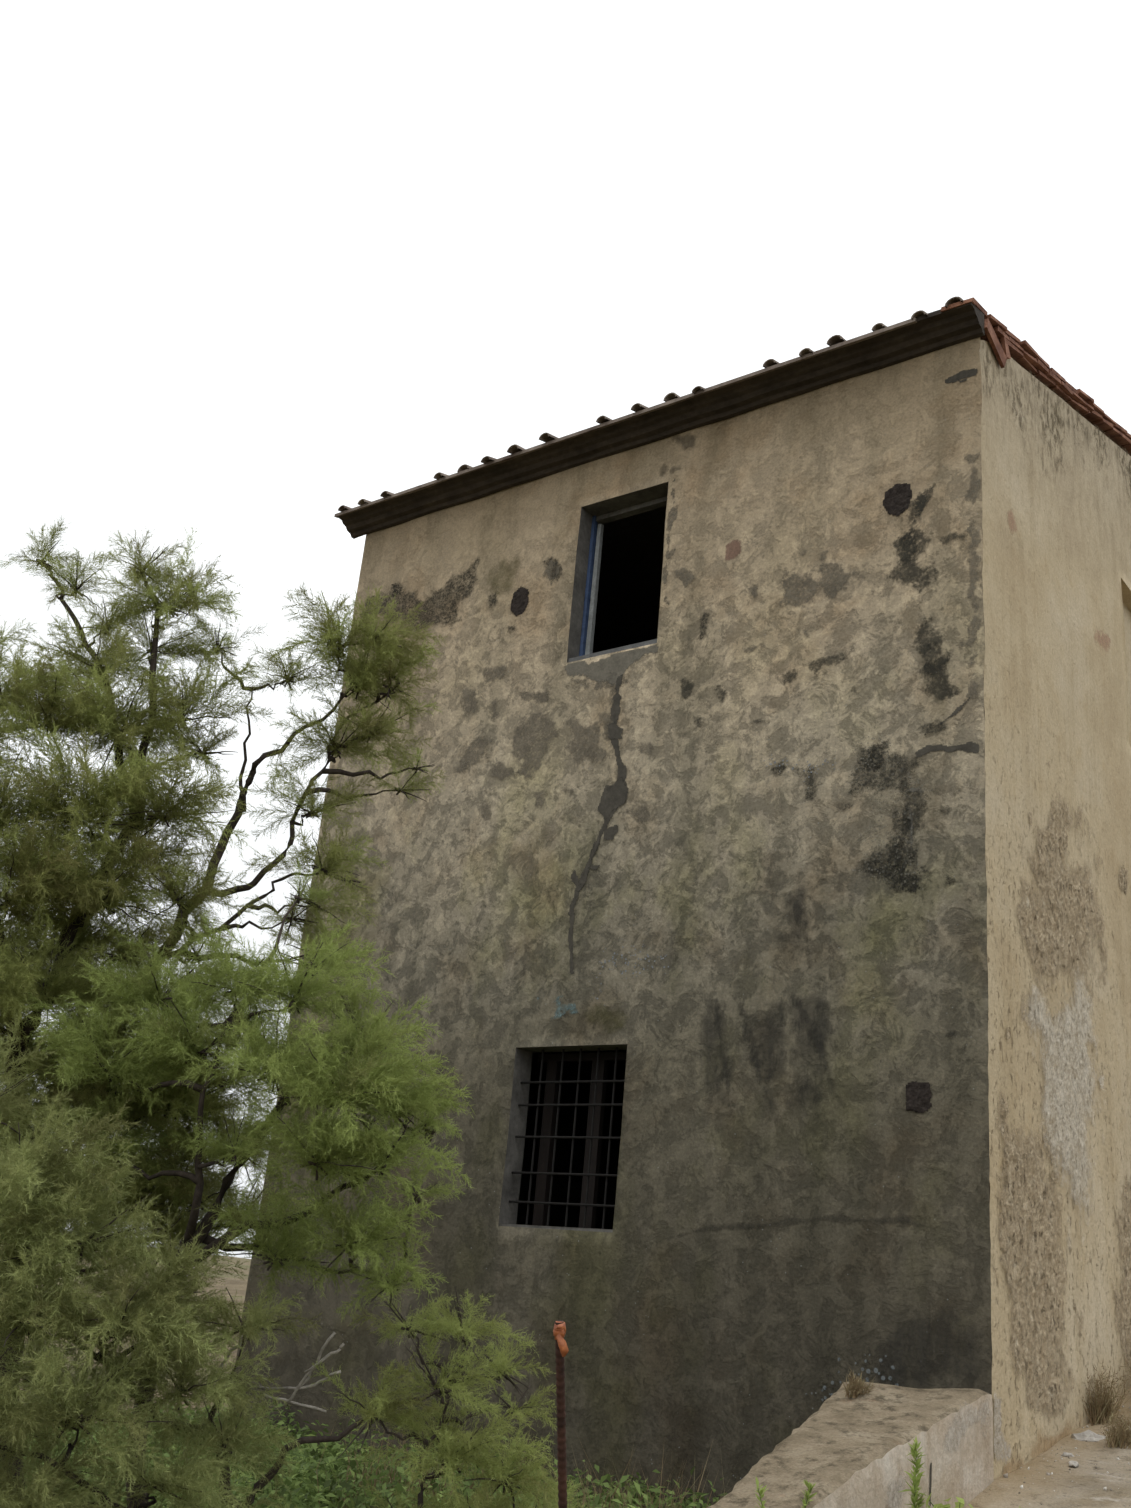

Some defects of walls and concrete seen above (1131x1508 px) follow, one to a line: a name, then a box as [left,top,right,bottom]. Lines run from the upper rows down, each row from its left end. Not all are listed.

spalling [883,483,912,516]
spalling [510,586,529,616]
crack [916,697,979,757]
crack [568,674,629,974]
spalling [1018,801,1107,993]
spalling [906,1081,932,1113]